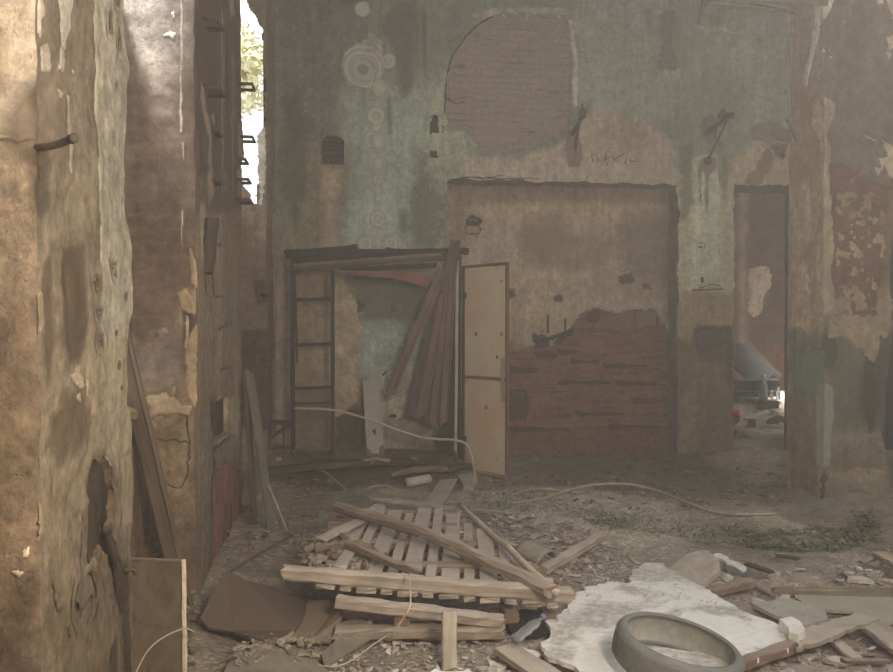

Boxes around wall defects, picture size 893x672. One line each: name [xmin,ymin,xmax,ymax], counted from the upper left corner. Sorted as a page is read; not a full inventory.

peeling [37,0,75,75]
spalling [424,6,579,182]
peeling [803,0,893,363]
peeling [146,248,198,420]
spalling [497,301,679,433]
peeling [747,266,772,318]
spalling [71,437,134,641]